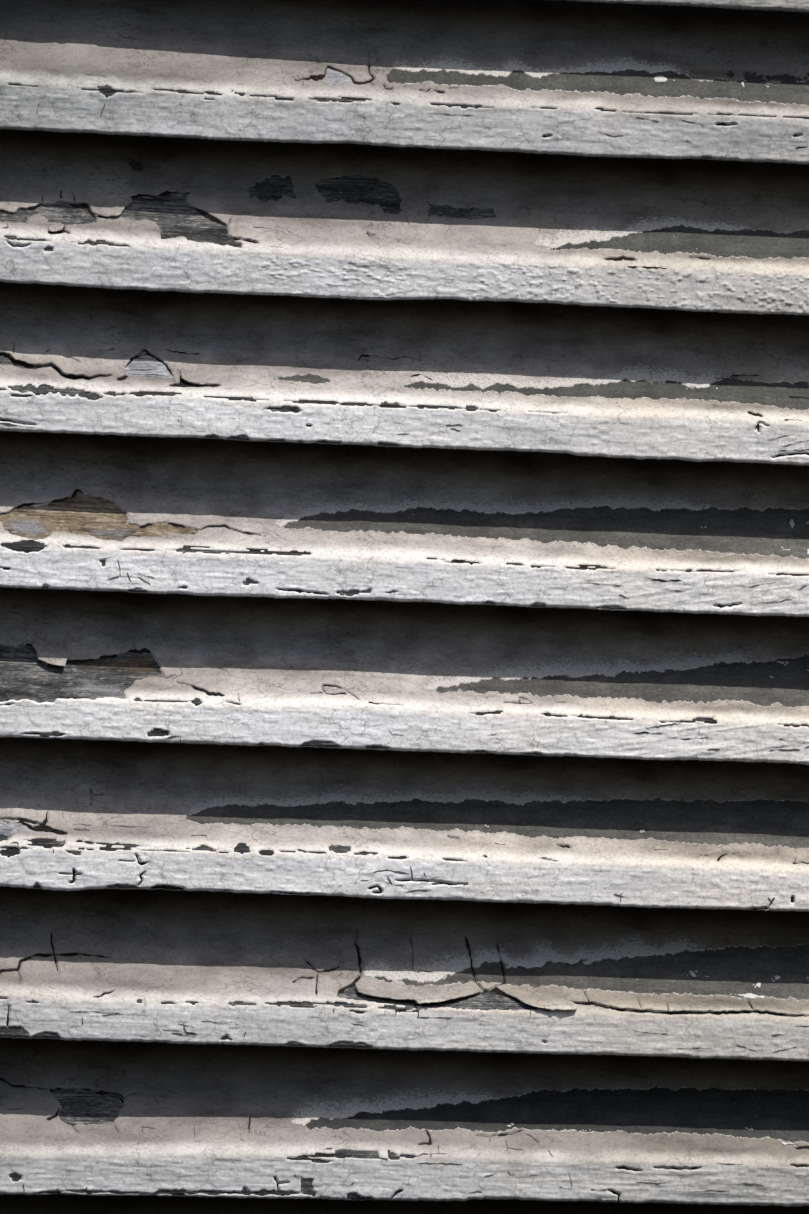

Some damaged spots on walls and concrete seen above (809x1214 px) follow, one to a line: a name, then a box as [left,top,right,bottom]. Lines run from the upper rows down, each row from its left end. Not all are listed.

crack [0,343,115,380]
crack [164,345,220,387]
peeling [204,363,809,431]
peeling [275,489,809,576]
peeling [0,633,203,706]
peeling [422,644,809,724]
peeling [0,782,809,859]
crack [0,933,109,983]
crack [95,991,119,1016]
crack [139,1021,250,1039]
crack [292,960,339,995]
peeling [287,1086,809,1163]